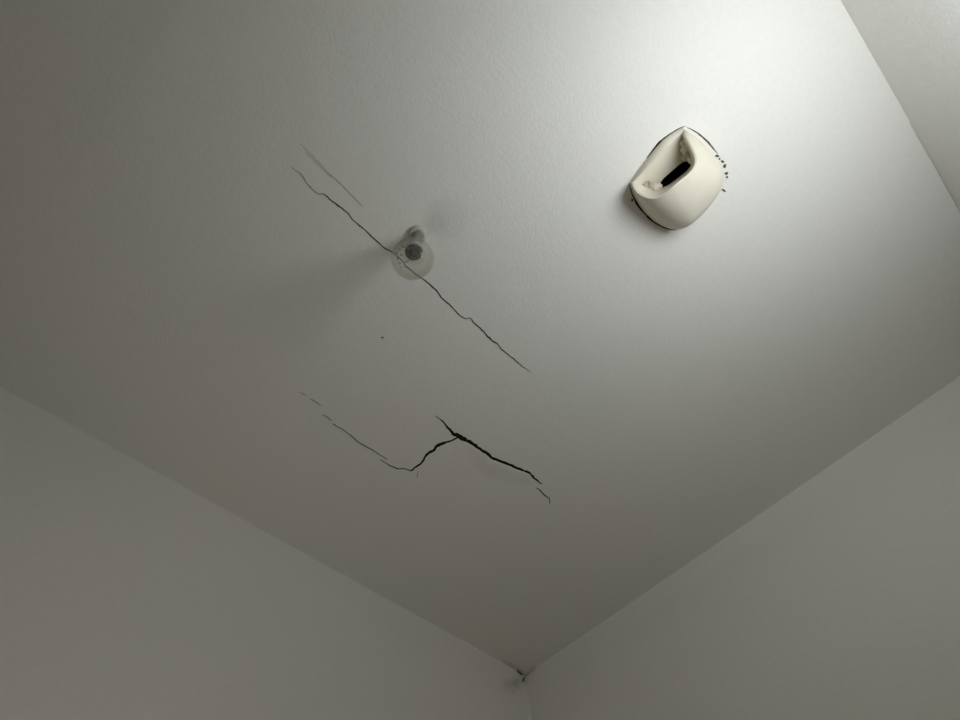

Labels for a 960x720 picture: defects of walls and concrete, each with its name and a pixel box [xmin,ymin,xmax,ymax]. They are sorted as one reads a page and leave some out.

crack [292,143,529,371]
crack [300,392,550,503]